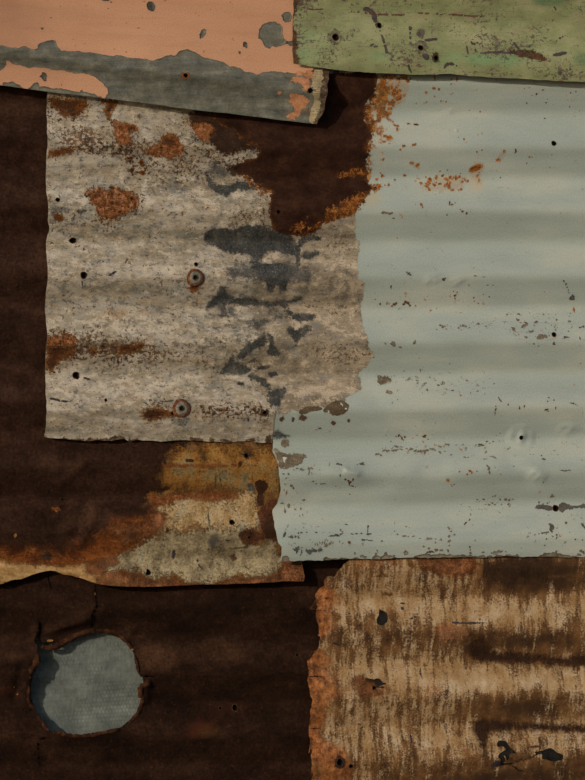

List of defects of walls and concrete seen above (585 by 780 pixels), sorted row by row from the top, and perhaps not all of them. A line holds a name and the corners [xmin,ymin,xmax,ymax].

peeling [258,12,292,49]
peeling [416,29,438,60]
peeling [509,49,567,62]
peeling [0,40,326,124]
corrosion [46,71,419,242]
peeling [504,313,571,347]
corrosion [45,324,145,375]
peeling [377,375,392,394]
corrosion [0,438,305,594]
corrosion [416,556,552,588]
corrosion [439,626,585,667]
corrosion [472,719,585,749]